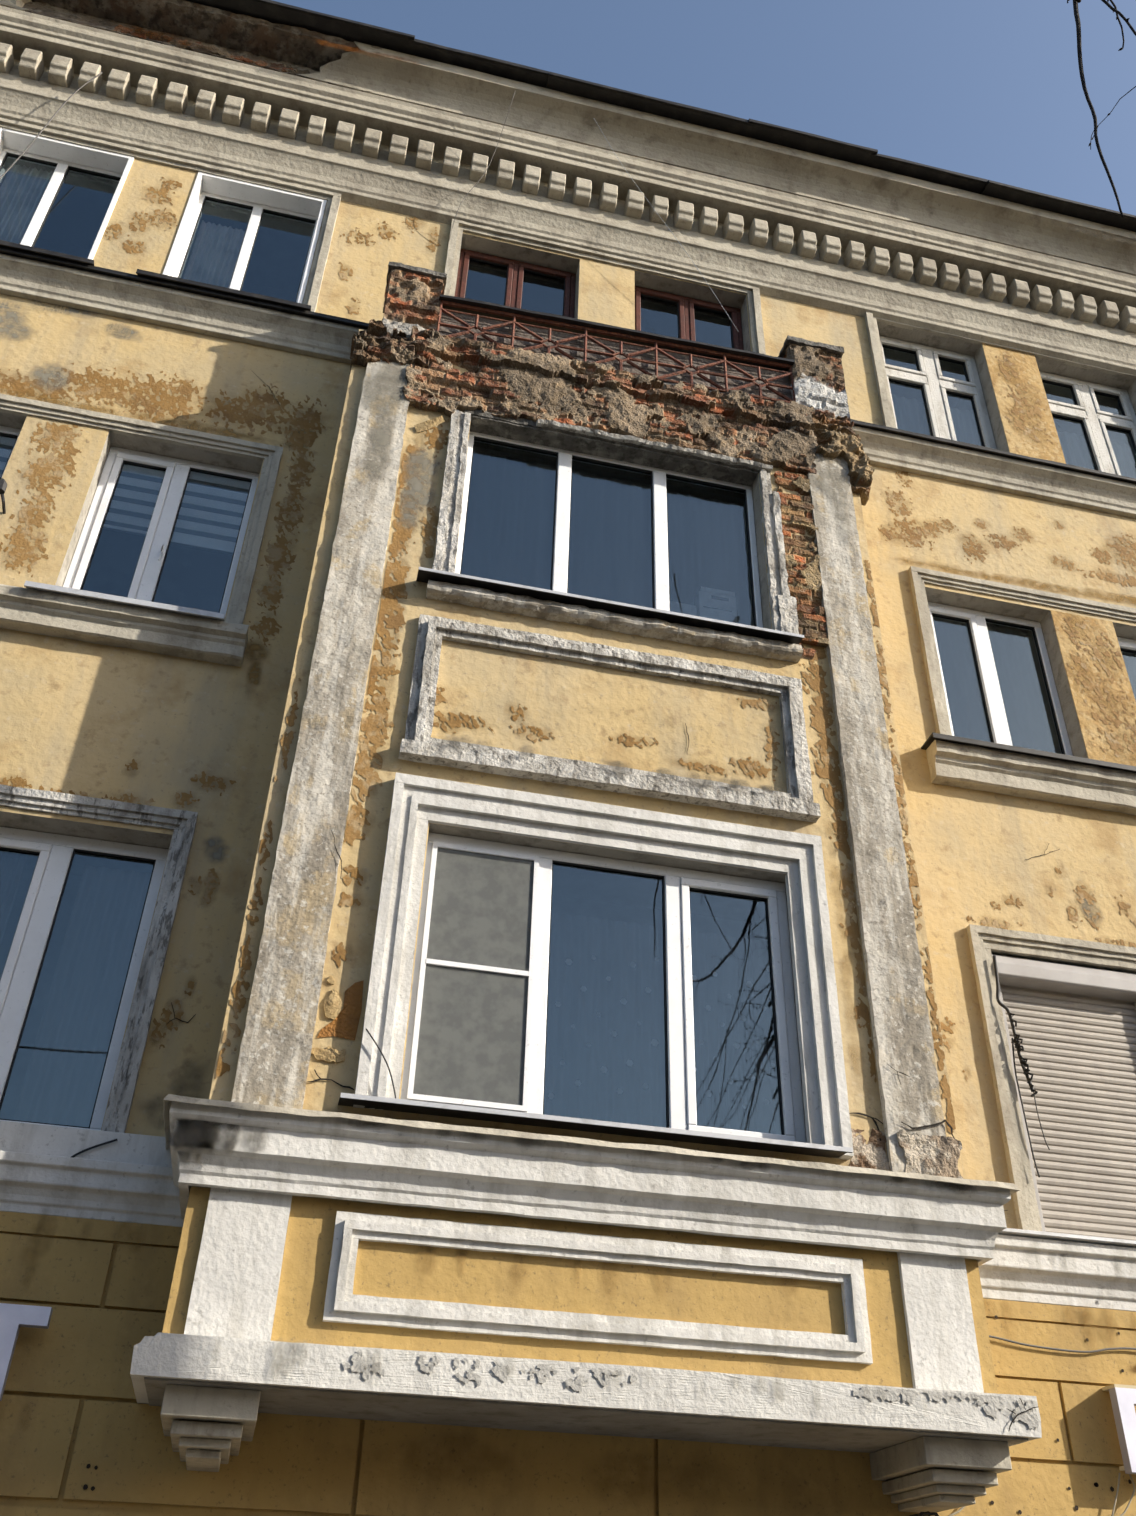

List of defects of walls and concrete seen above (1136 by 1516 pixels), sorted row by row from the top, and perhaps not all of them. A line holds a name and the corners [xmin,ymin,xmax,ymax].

spalling [114,25,310,74]
peeling [340,217,441,252]
peeling [0,363,327,647]
peeling [1052,532,1136,587]
spalling [339,262,1034,1083]
peeling [1061,617,1136,757]
peeling [0,775,155,806]
peeling [175,771,236,808]
peeling [849,560,968,1179]
peeling [332,942,347,968]